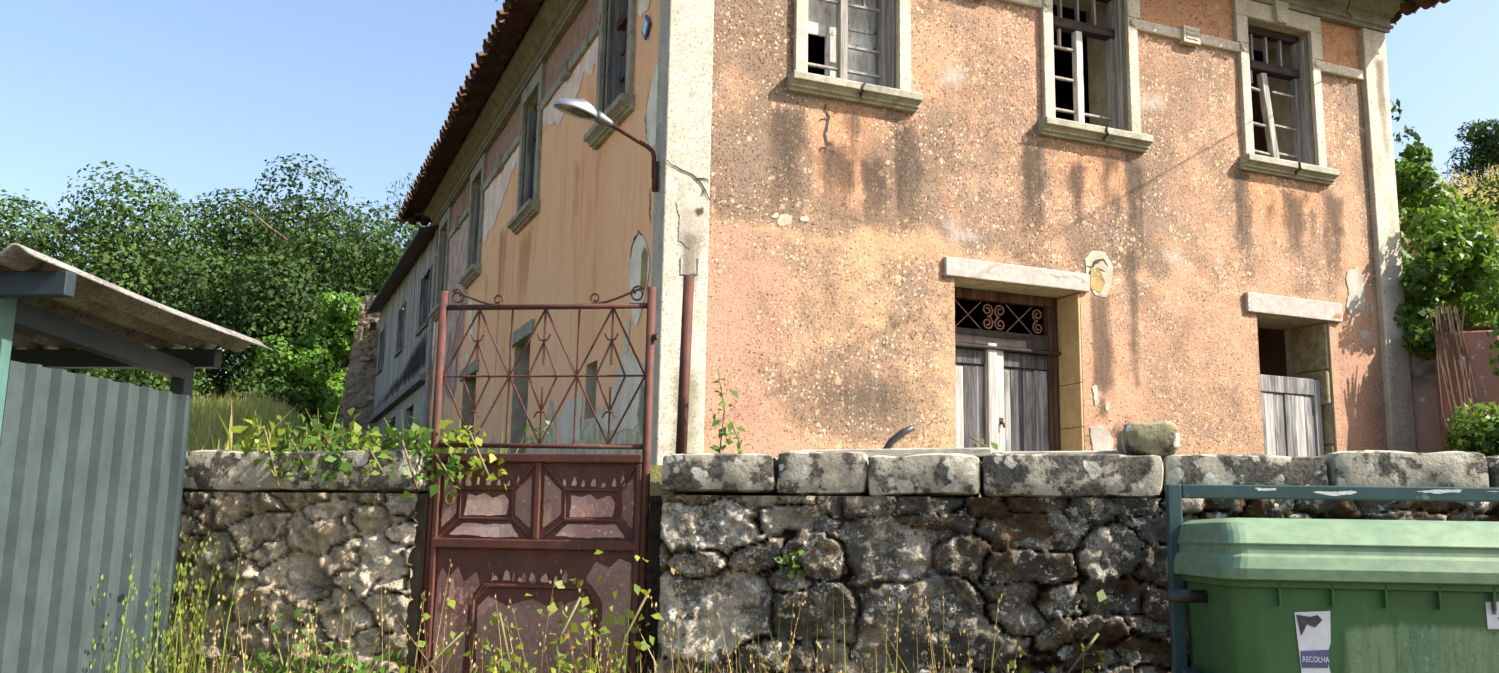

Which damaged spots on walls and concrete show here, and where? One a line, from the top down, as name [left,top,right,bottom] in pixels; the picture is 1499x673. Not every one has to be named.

flaking render [543,37,598,131]
damp [773,110,802,174]
damp [824,128,919,195]
damp [1024,148,1042,204]
damp [1072,165,1082,206]
damp [1106,160,1142,219]
damp [1235,174,1250,223]
damp [1285,194,1302,240]
damp [1327,193,1343,240]
damp [1093,297,1112,412]